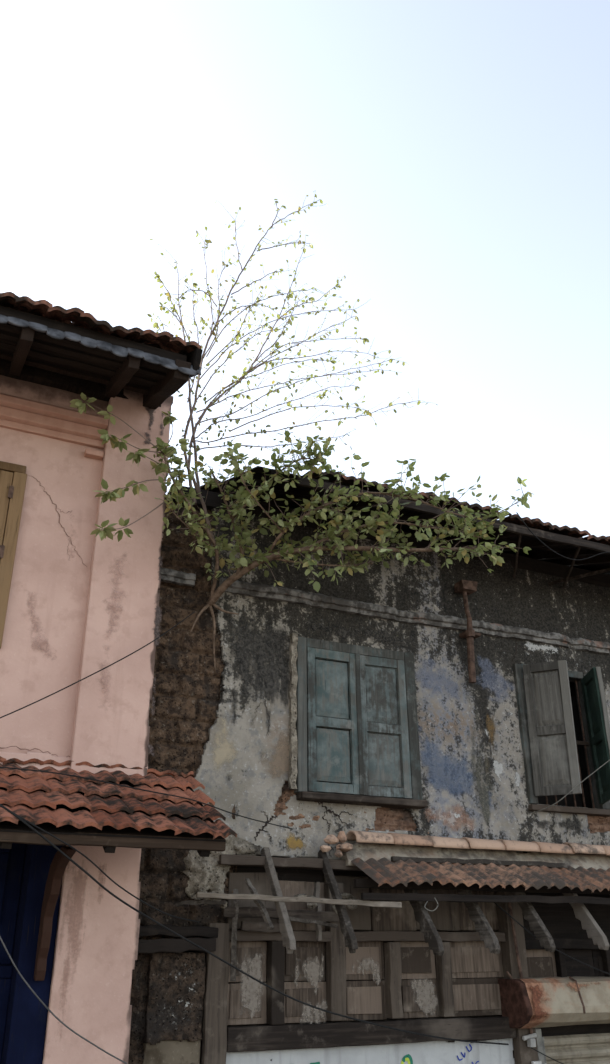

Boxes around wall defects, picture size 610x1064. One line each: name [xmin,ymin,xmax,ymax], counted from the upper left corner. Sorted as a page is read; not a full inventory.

crack [32,476,87,567]
damp [230,618,289,731]
spalling [274,781,320,829]
spalling [364,807,429,834]
damp [472,736,492,824]
peeling [493,761,503,778]
spalling [587,815,610,833]
spalling [180,834,262,901]